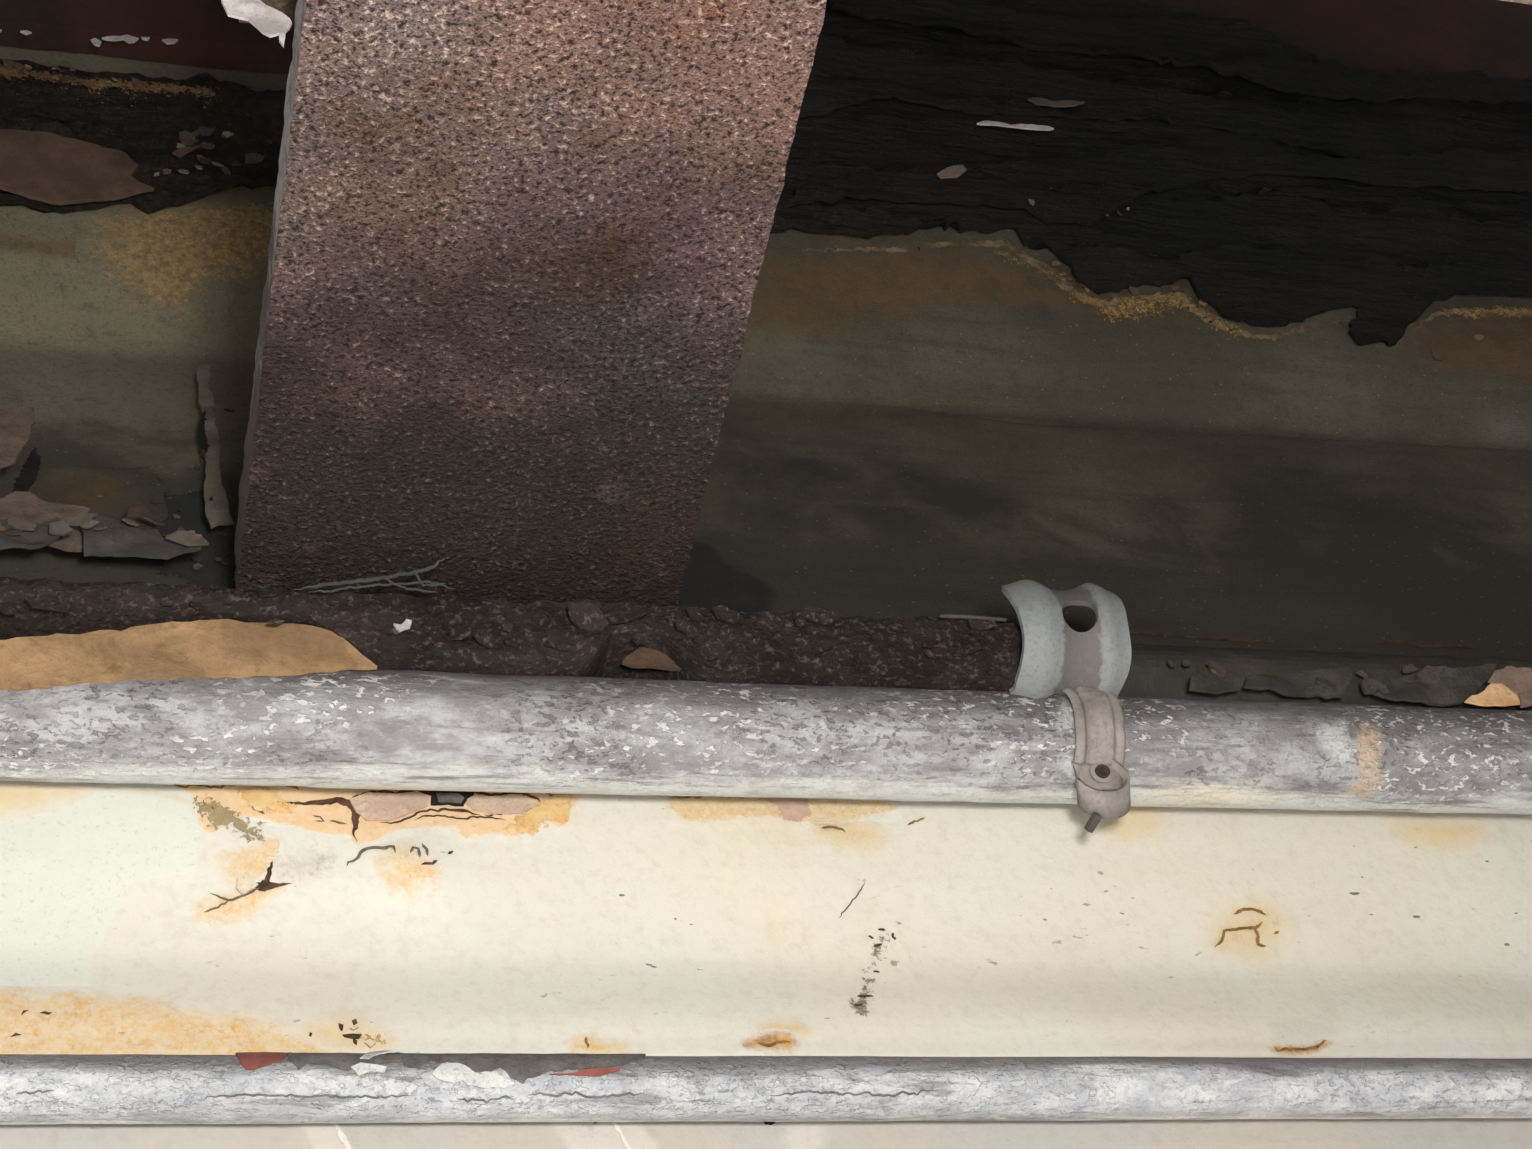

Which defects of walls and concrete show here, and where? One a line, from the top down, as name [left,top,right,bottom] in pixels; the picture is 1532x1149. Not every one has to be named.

peeling [976,121,1054,131]
peeling [1028,97,1085,108]
peeling [0,129,154,205]
peeling [937,165,967,179]
peeling [0,619,377,691]
peeling [1189,661,1532,708]
spalling [167,784,602,847]
crack [347,836,457,910]
rust [1178,876,1317,979]
rust [0,981,414,1055]
rust [724,1013,826,1056]